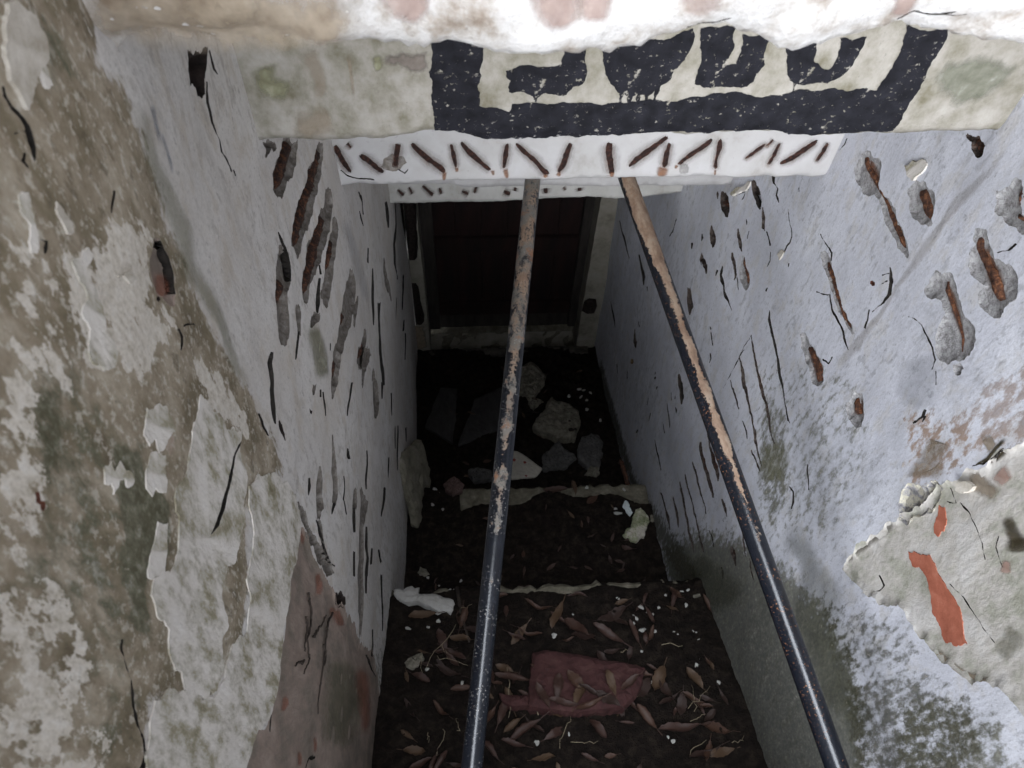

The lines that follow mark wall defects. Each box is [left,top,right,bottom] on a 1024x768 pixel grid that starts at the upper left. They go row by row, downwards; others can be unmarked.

crack [2,86,36,168]
crack [201,50,236,176]
spalling [263,138,339,360]
corrosion [334,142,581,196]
corrosion [606,142,614,177]
corrosion [629,136,722,176]
spalling [854,150,909,258]
spalling [904,159,935,227]
spalling [968,228,1018,318]
spalling [924,270,976,376]
crack [211,442,241,534]
peeling [103,394,380,768]